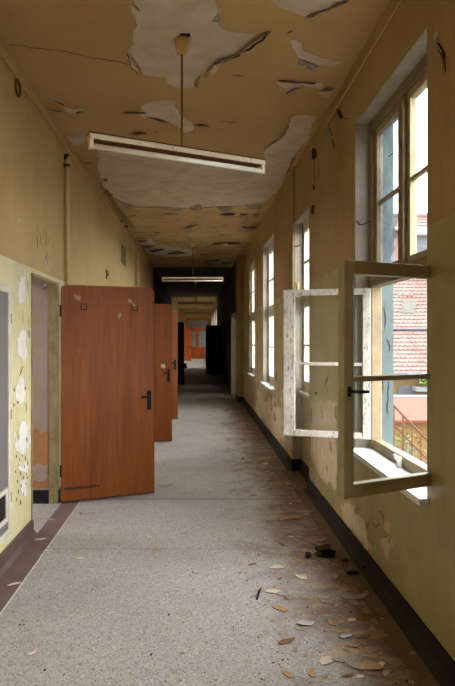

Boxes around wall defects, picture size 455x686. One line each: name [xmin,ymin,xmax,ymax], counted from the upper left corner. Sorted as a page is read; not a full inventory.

peeling [270,0,349,19]
peeling [126,0,270,89]
peeling [287,31,343,70]
peeling [277,80,334,99]
peeling [124,100,209,133]
peeling [84,114,317,229]
peeling [138,235,233,265]
spalling [13,264,49,505]
peeling [309,375,393,560]